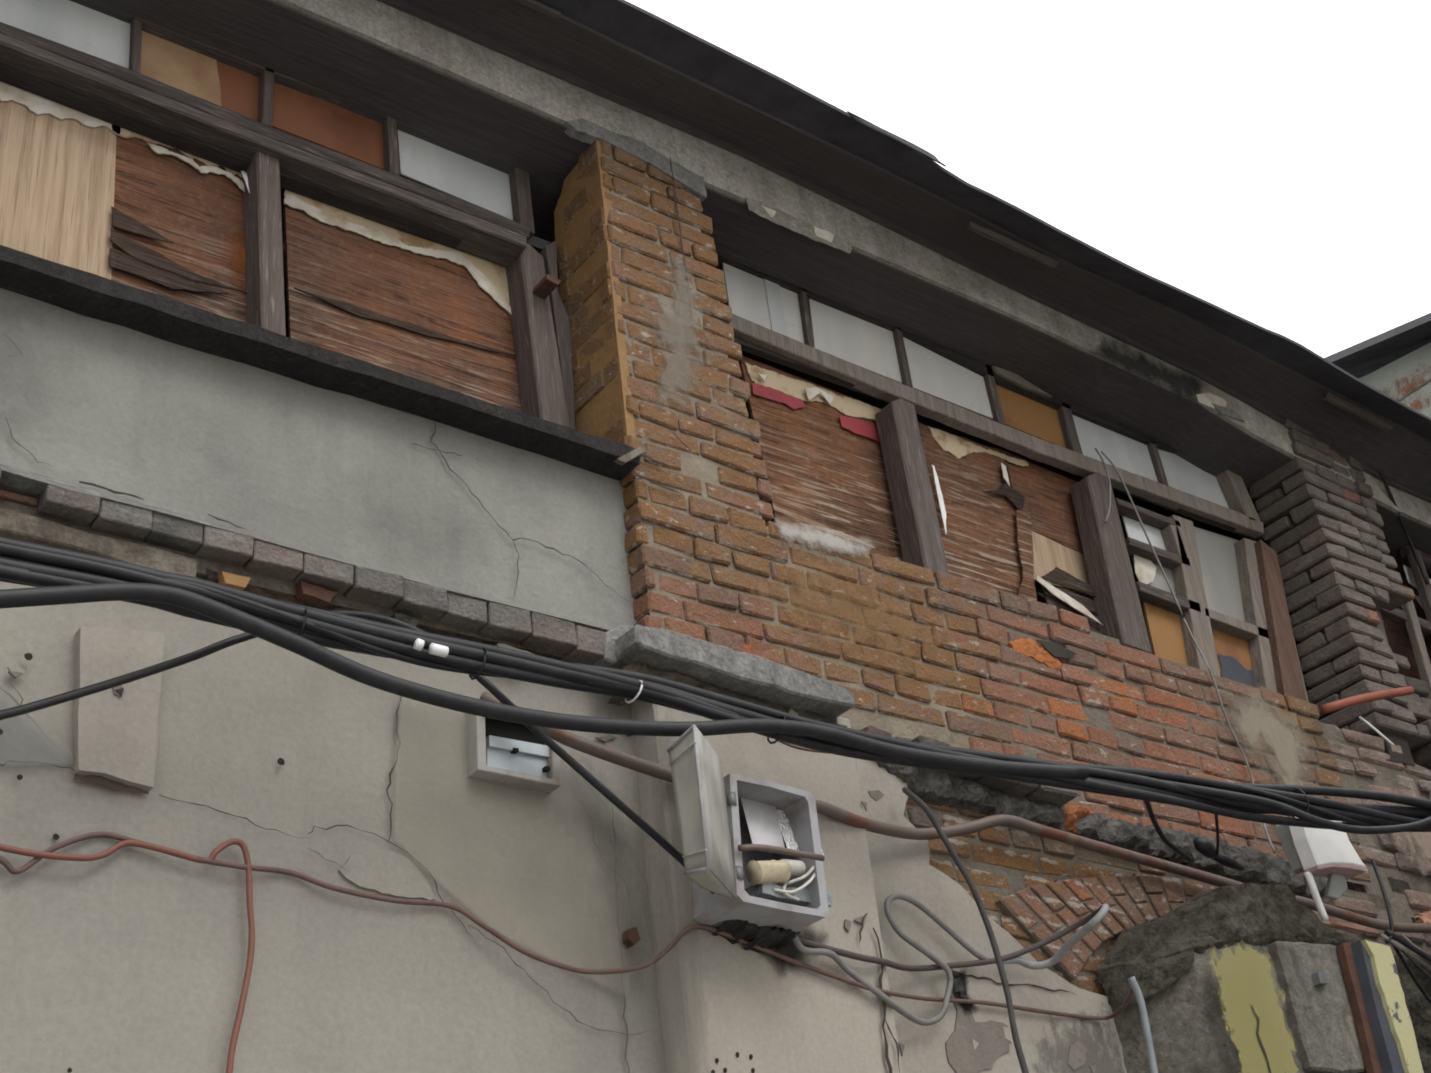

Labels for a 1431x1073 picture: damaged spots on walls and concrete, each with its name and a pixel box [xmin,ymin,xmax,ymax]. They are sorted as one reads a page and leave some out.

crack [5,417,144,500]
crack [208,514,245,529]
crack [411,418,628,601]
peeling [861,790,884,811]
spalling [1328,724,1431,805]
crack [39,696,648,1073]
spalling [876,762,1431,996]
peeling [945,992,1012,1073]